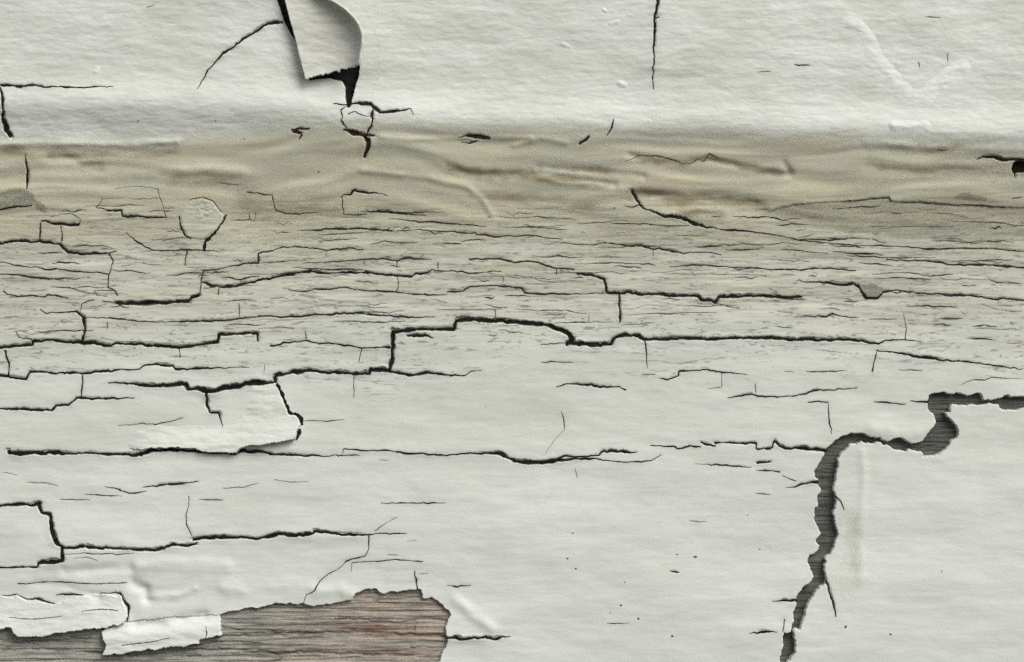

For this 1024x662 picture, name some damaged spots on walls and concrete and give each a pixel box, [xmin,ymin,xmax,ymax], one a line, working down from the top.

crack [197,21,283,89]
peeling [277,0,364,108]
crack [651,0,659,89]
crack [0,84,113,189]
crack [333,102,414,157]
crack [0,182,1024,662]
peeling [0,589,451,662]